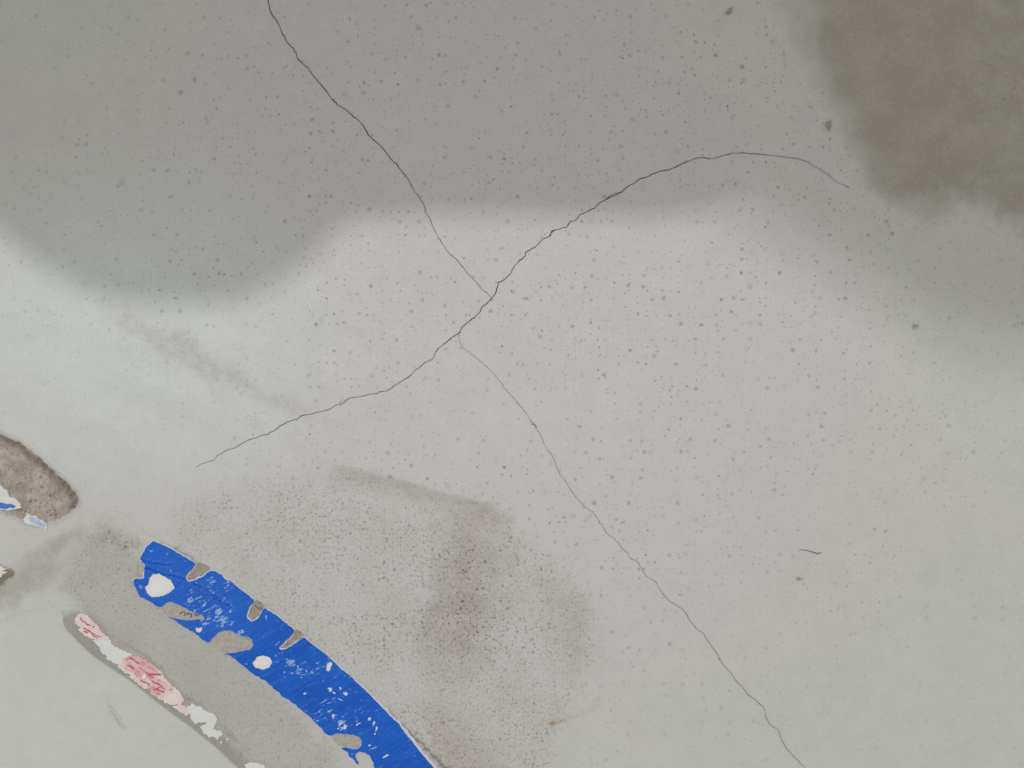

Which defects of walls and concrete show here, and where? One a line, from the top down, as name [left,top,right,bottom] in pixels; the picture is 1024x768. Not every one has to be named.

leakage [762,0,1024,251]
crack [200,1,849,768]
peeling [187,563,210,580]
peeling [135,563,204,633]
peeling [247,600,264,621]
peeling [210,630,272,670]
peeling [281,629,305,648]
peeling [75,614,229,744]
peeling [332,733,361,749]